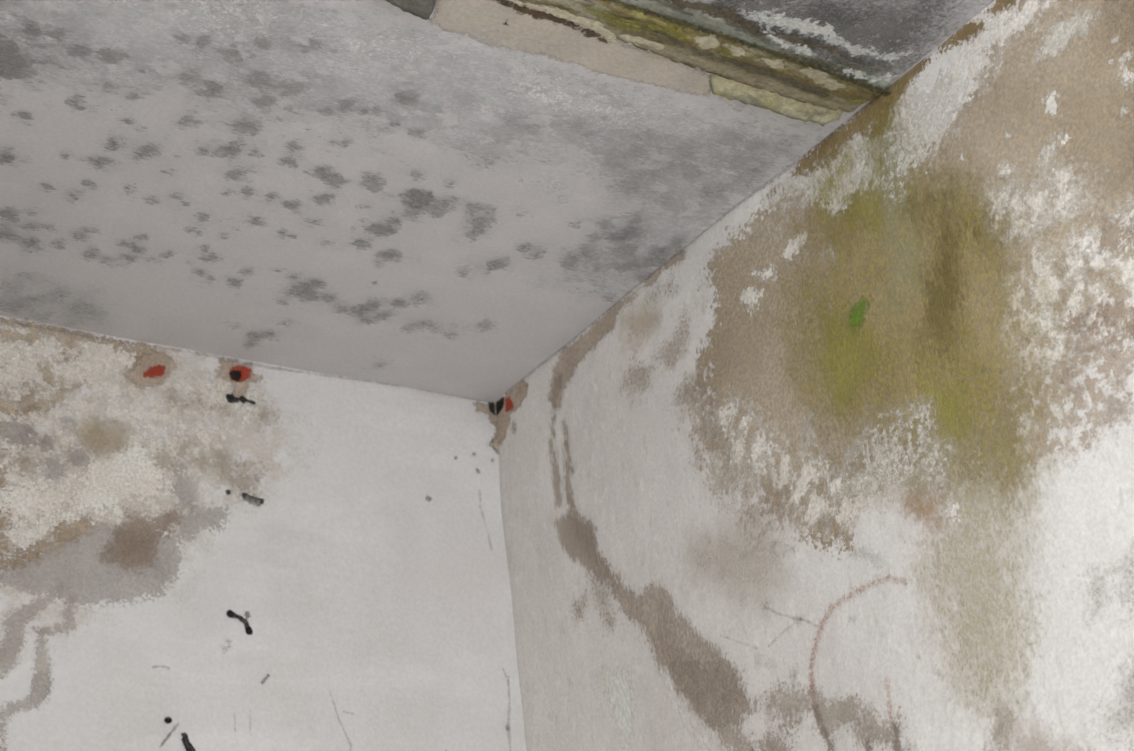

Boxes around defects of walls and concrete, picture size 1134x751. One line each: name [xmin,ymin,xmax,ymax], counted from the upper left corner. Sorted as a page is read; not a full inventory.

water stain [0,0,900,751]
spalling [430,0,863,103]